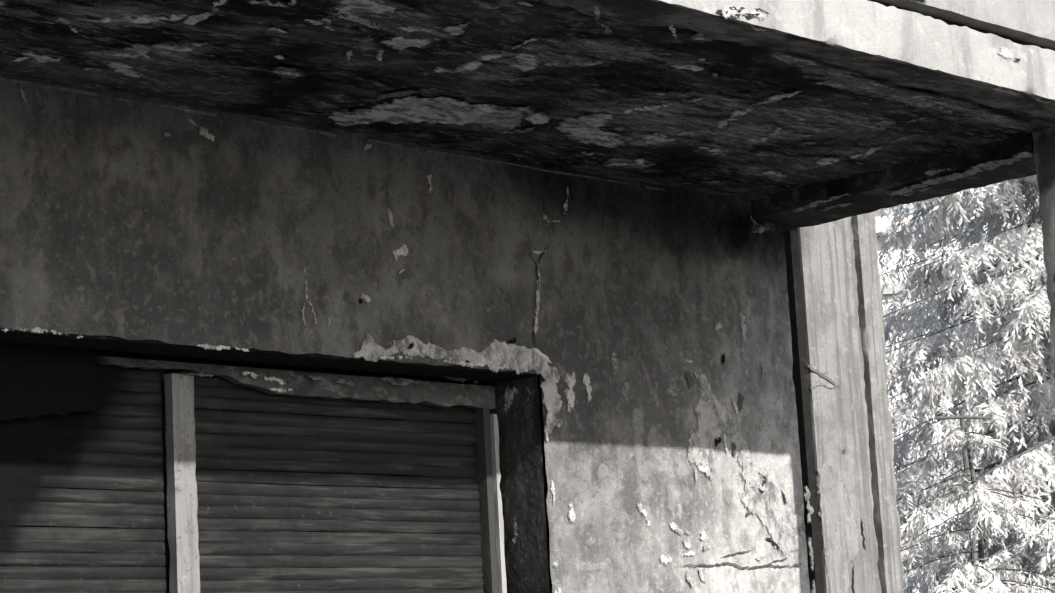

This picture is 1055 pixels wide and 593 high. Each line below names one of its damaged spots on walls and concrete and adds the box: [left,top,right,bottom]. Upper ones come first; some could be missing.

peeling [0,0,227,36]
peeling [82,41,209,77]
peeling [305,0,469,61]
peeling [434,5,718,81]
spalling [717,6,769,31]
peeling [328,52,1032,181]
spalling [884,152,1033,197]
crack [529,177,574,346]
peeling [242,371,292,393]
flaking render [354,332,592,441]
flaking render [685,359,866,593]
crack [660,550,795,586]